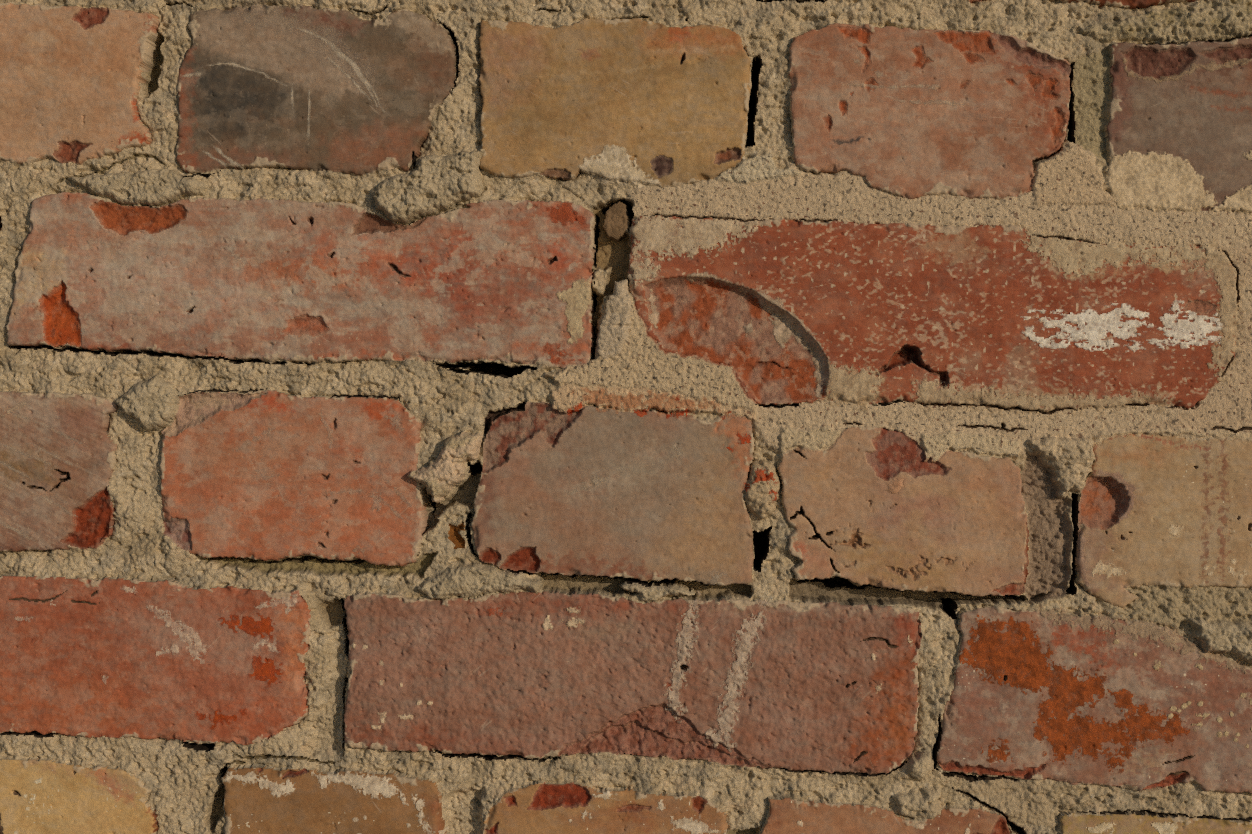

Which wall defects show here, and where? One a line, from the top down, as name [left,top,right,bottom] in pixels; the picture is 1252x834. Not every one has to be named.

spalling [643,277,829,404]
spalling [60,488,116,549]
crack [790,506,840,573]